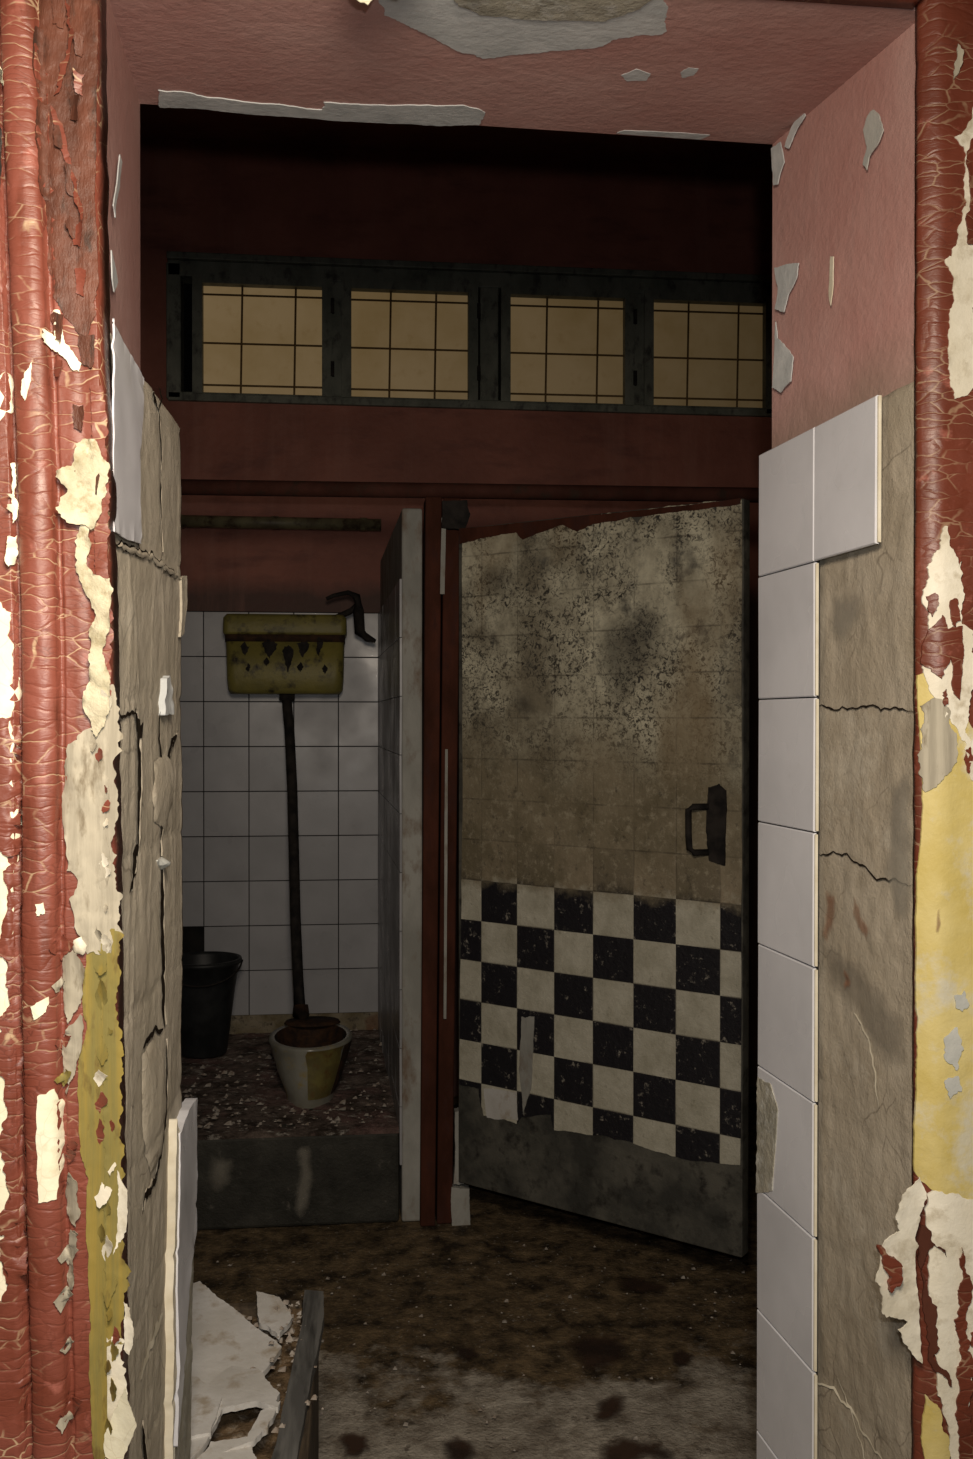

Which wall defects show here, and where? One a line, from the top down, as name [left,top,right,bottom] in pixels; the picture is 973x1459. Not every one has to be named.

peeling [357,0,668,59]
peeling [158,90,485,126]
peeling [945,108,973,399]
crack [819,704,913,712]
spalling [0,0,292,1459]
crack [819,851,913,886]
spalling [813,382,973,1459]
crack [120,709,177,1214]
water stain [597,1396,623,1419]
water stain [342,1433,369,1455]
water stain [445,1438,473,1459]
water stain [604,1439,670,1459]